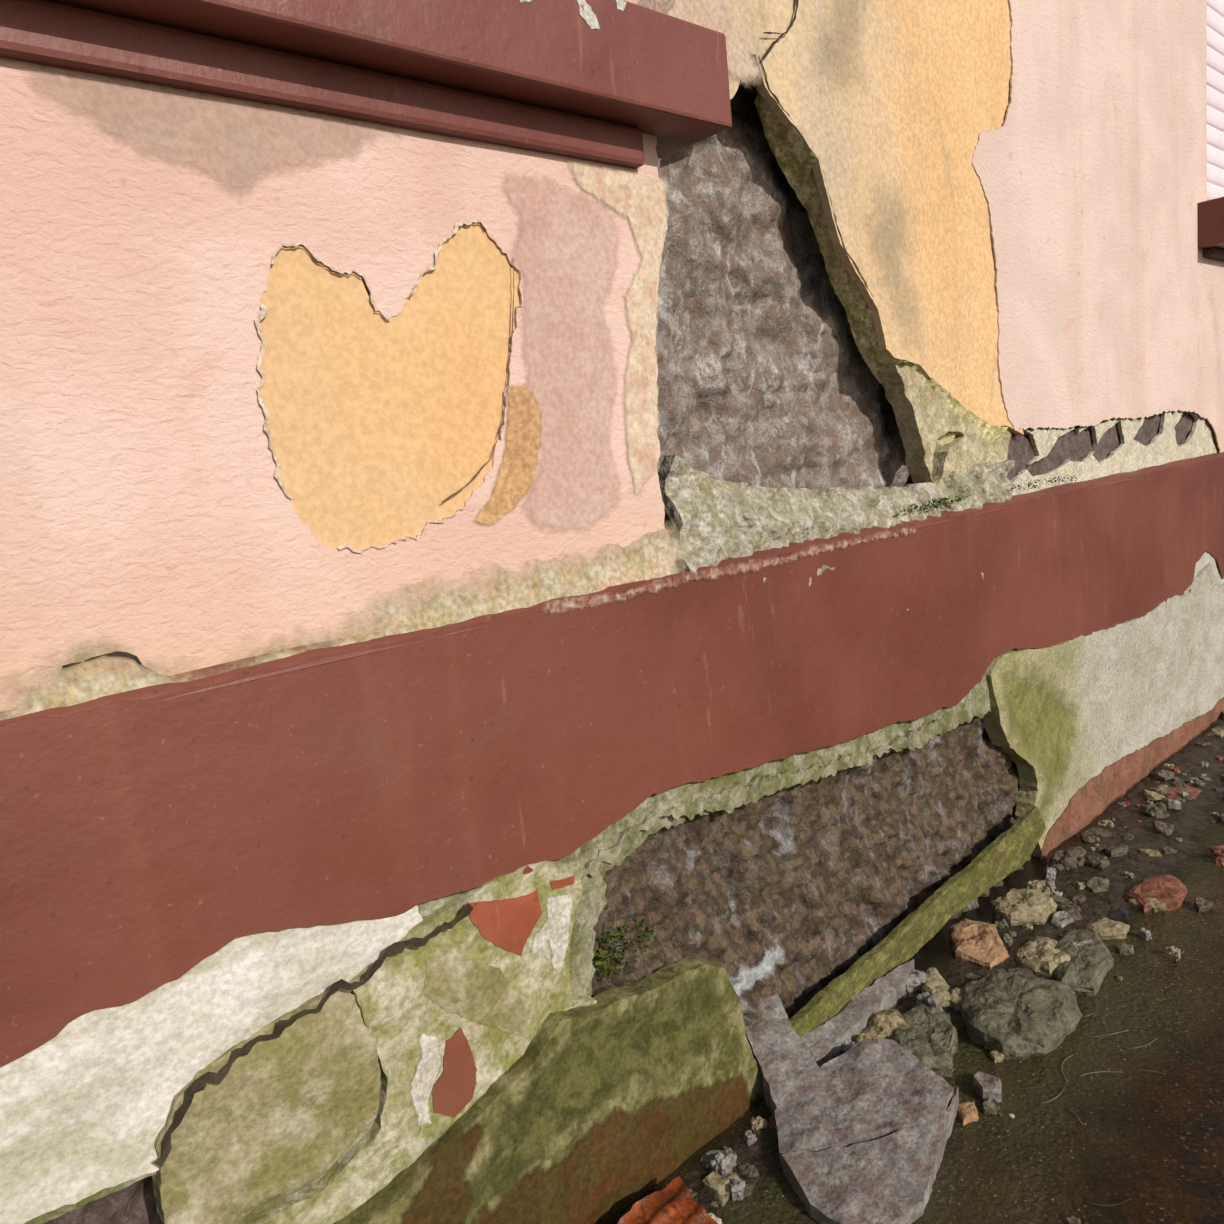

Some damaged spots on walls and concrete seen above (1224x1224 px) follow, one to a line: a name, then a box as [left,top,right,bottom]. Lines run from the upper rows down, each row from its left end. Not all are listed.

spalling [248,0,1219,666]
crack [762,0,799,59]
crack [154,903,473,1168]
spalling [0,552,1224,1224]